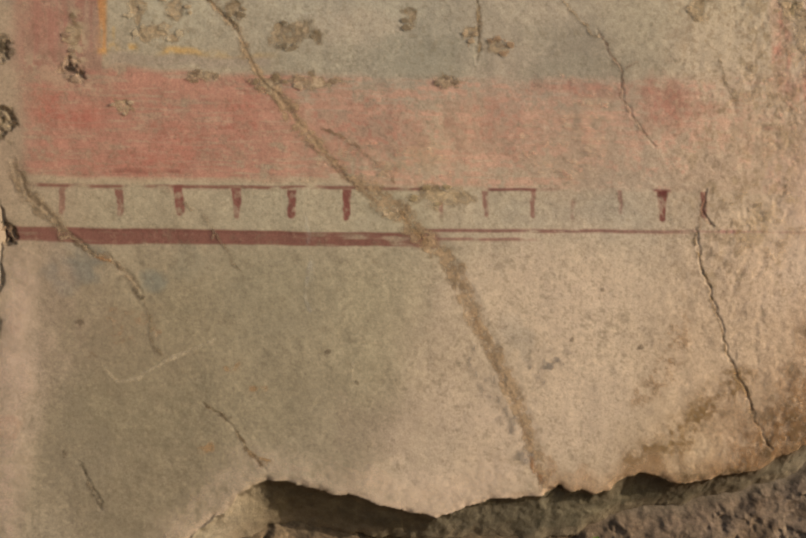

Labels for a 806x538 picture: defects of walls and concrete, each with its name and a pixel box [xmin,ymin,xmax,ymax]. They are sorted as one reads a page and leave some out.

spalling [0,34,13,64]
spalling [57,12,85,83]
spalling [123,0,192,43]
spalling [268,20,322,51]
spalling [248,70,343,94]
crack [563,1,649,139]
spalling [0,105,18,144]
crack [10,163,162,354]
crack [207,0,563,489]
crack [694,197,760,432]
leakage [615,363,806,484]